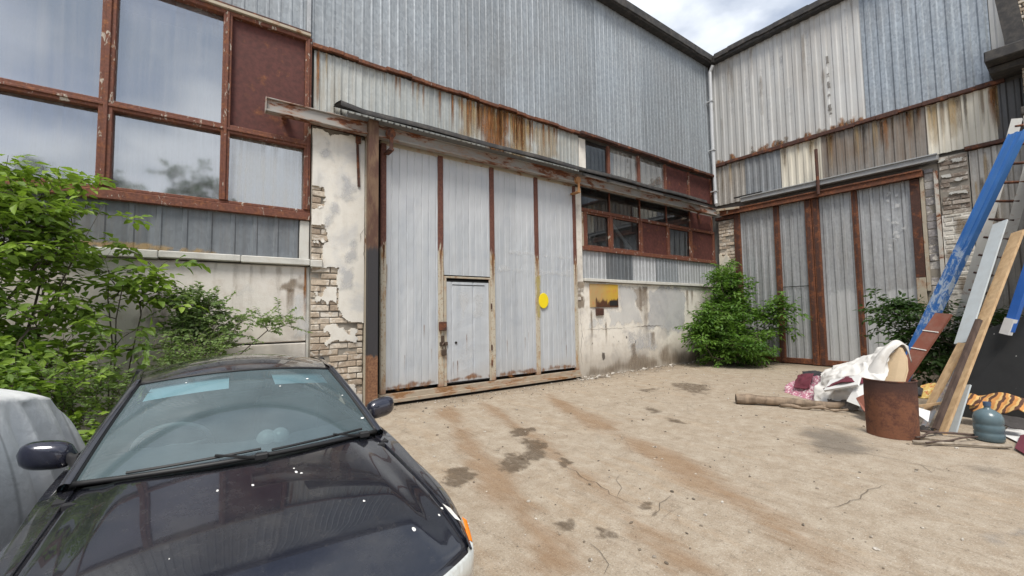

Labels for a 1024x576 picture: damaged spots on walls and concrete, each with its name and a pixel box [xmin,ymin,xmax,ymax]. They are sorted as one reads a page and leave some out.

corrosion [439,91,557,157]
corrosion [751,94,967,153]
corrosion [980,86,998,118]
spalling [312,186,326,209]
spalling [310,223,363,394]